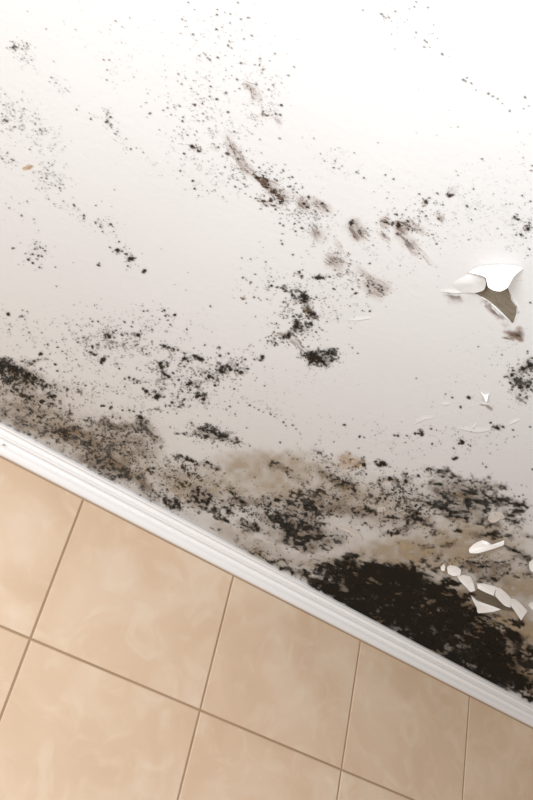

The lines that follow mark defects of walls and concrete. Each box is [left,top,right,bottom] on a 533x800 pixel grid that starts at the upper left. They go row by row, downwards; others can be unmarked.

water stain [216,145,335,245]
water stain [349,192,454,249]
water stain [240,269,340,369]
peeling [440,265,522,324]
water stain [0,324,533,702]
peeling [469,540,504,553]
peeling [441,564,533,620]